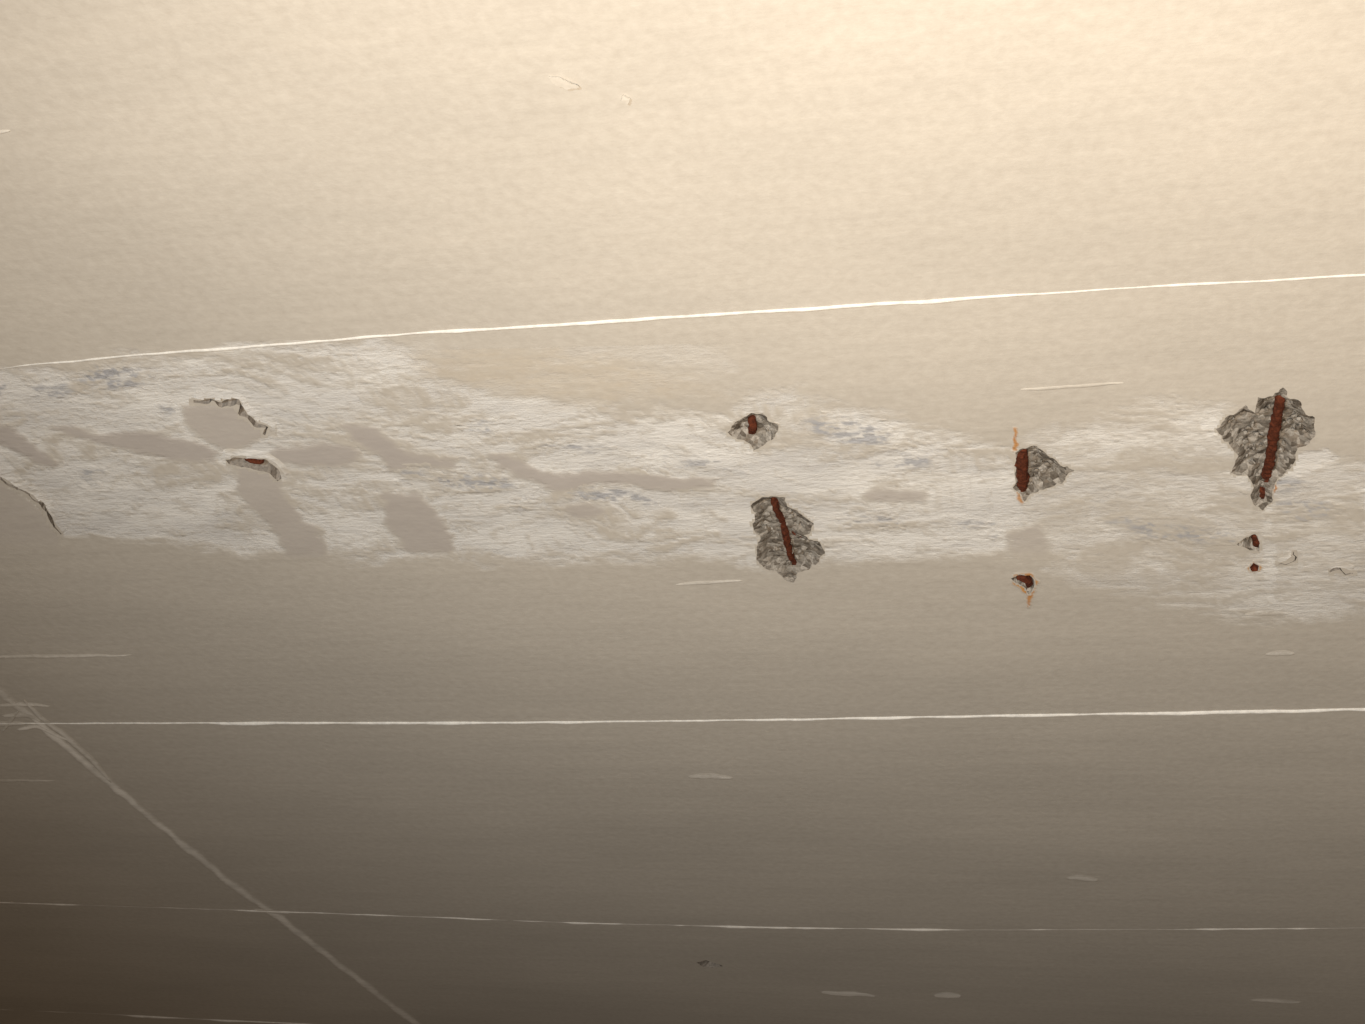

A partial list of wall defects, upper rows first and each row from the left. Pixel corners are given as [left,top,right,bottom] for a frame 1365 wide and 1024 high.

peeling [0,388,459,565]
damp [0,336,1365,639]
spalling [728,413,781,450]
spalling [1010,426,1074,505]
spalling [1216,388,1315,510]
spalling [751,496,825,582]
peeling [1002,521,1056,609]